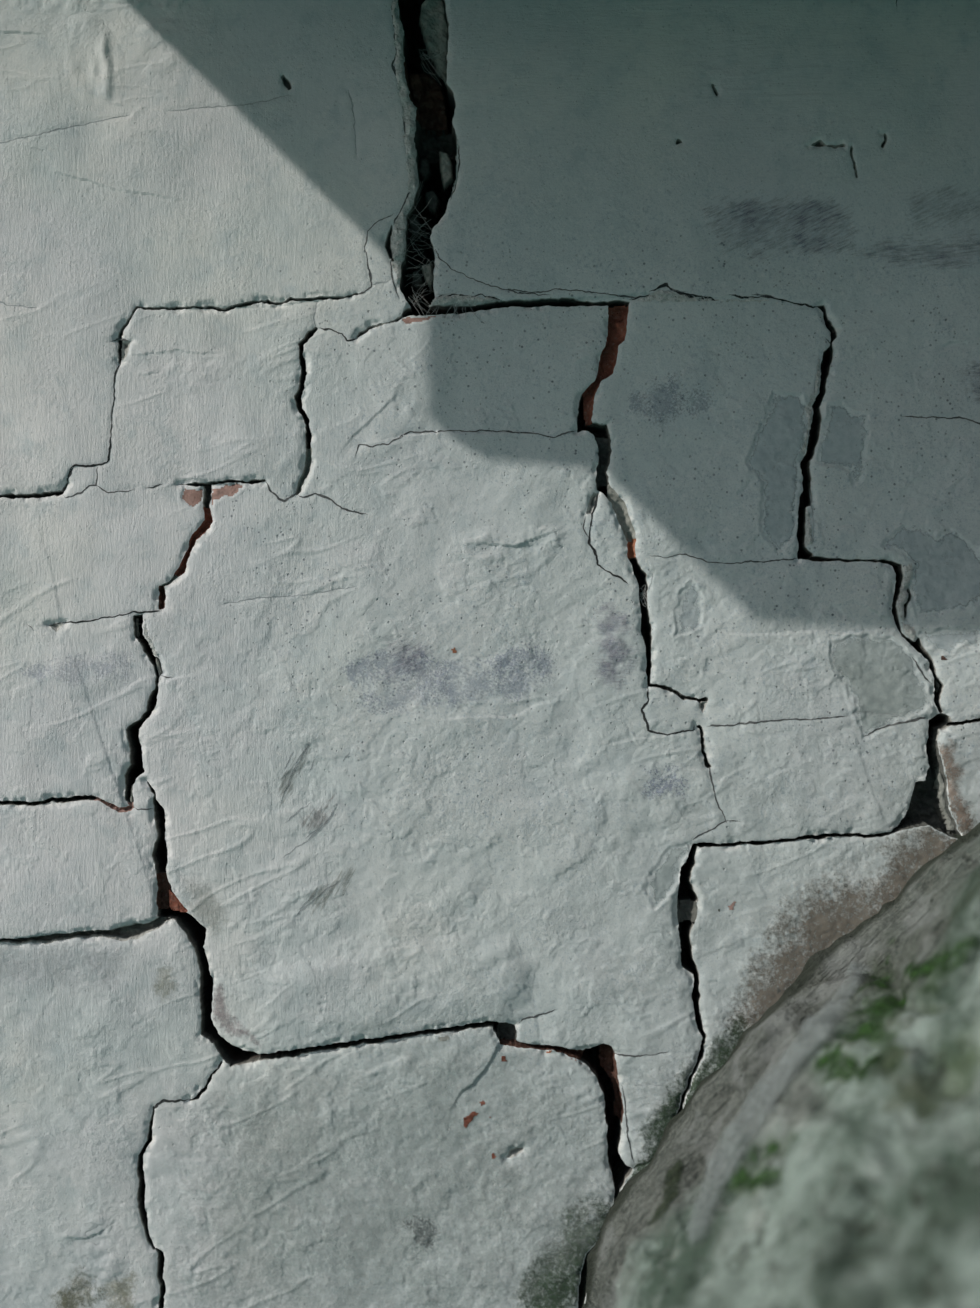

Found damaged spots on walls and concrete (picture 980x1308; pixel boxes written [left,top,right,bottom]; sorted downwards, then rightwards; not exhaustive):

crack [0,115,128,143]
crack [172,95,291,111]
crack [321,0,944,839]
crack [0,213,651,1308]
crack [677,829,896,1107]